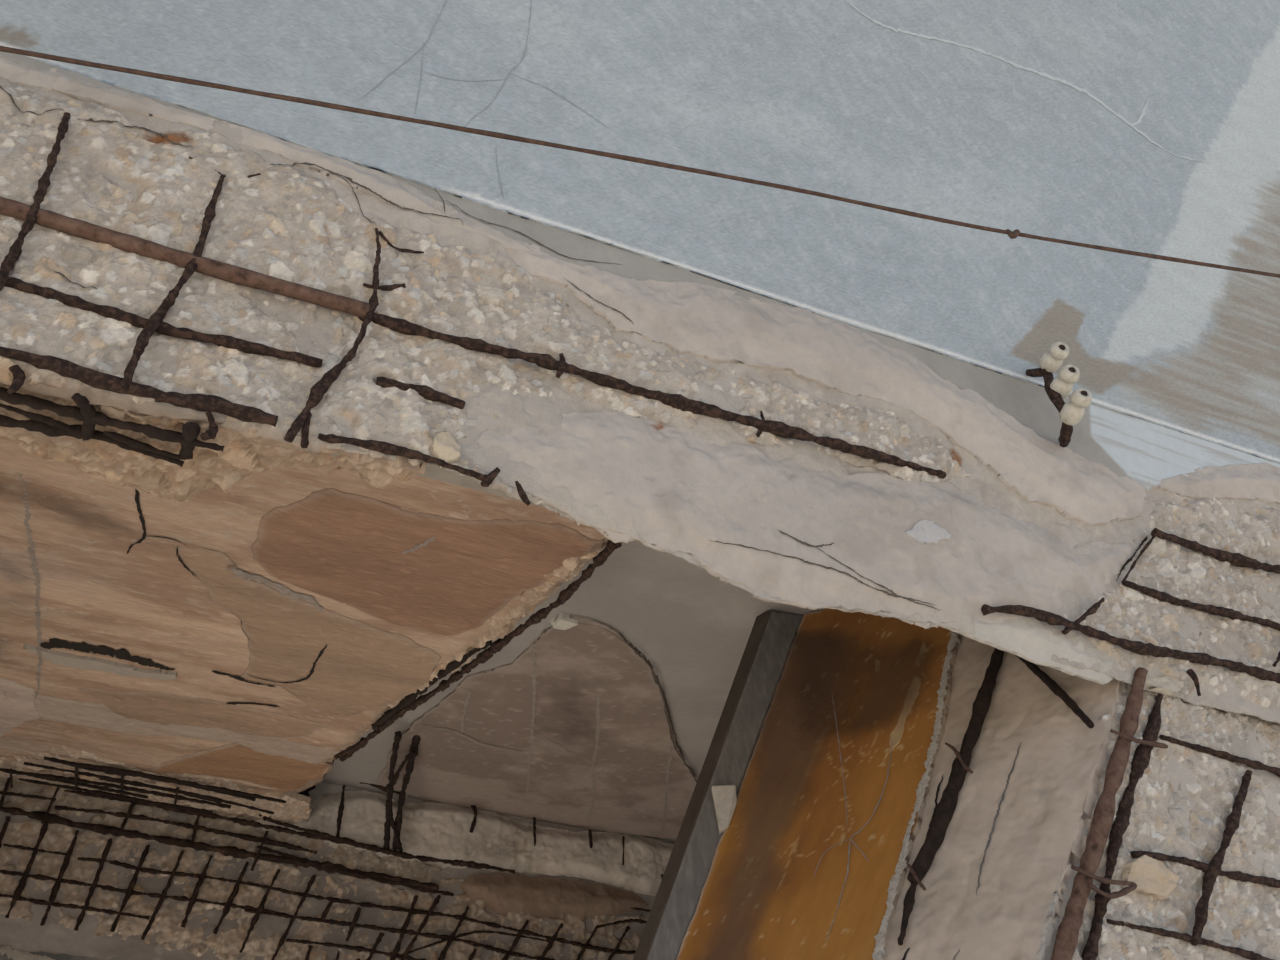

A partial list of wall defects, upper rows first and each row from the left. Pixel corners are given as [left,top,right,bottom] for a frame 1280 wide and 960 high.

corrosion [148,134,188,143]
crack [357,0,611,133]
crack [846,0,1210,163]
crack [269,148,634,324]
crack [127,489,194,576]
spalling [0,81,970,960]
crack [39,638,175,670]
crack [212,645,327,707]
crack [813,696,893,942]
crack [929,776,943,826]
crack [976,743,1021,895]
spalling [1063,497,1280,960]